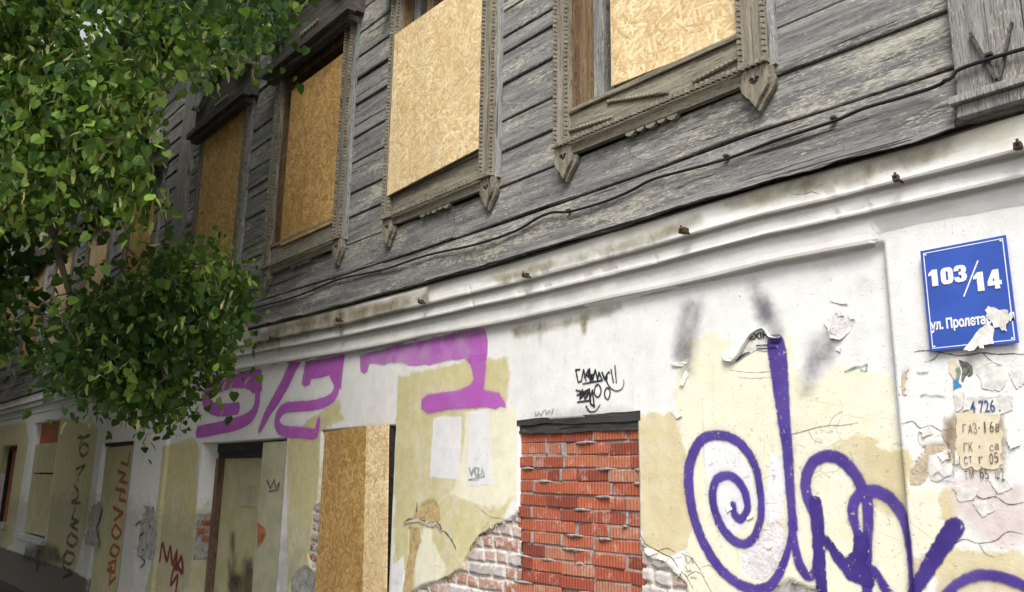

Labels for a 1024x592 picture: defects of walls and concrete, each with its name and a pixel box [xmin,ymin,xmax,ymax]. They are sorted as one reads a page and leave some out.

flaking render [900,369,908,396]
flaking render [909,426,950,487]
spalling [136,506,159,561]
spalling [193,514,211,560]
spalling [291,502,320,592]
spalling [403,500,523,592]
spalling [639,538,687,592]